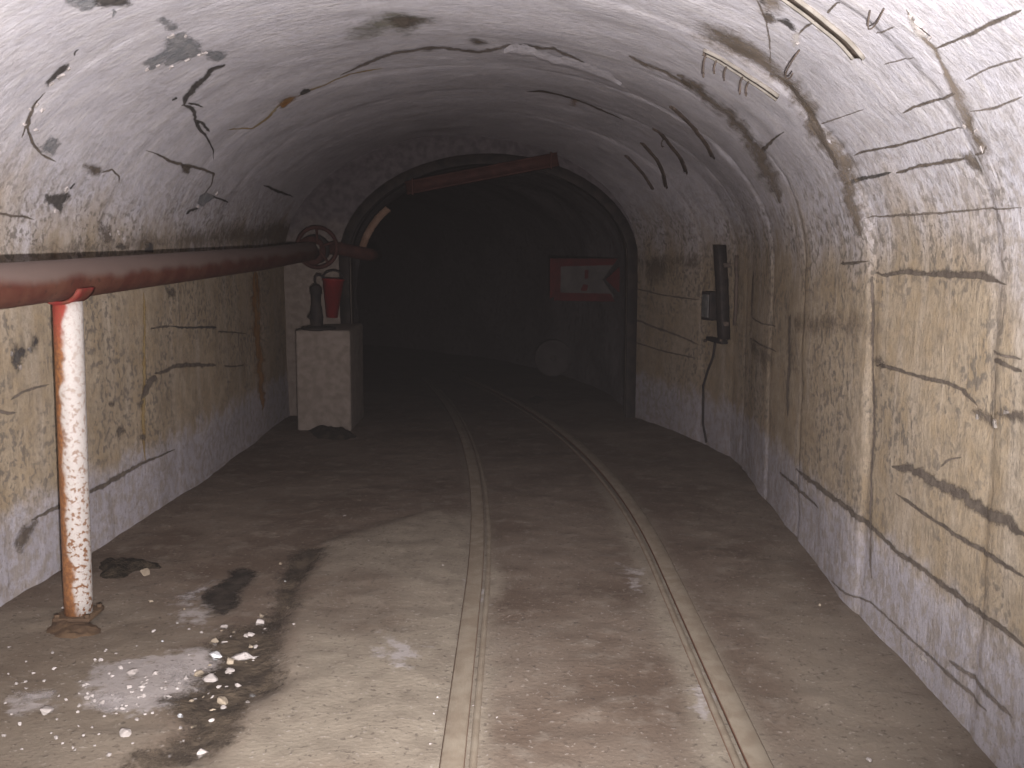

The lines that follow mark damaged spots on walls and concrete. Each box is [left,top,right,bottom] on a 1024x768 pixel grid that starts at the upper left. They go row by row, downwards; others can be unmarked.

spalling [144,18,226,72]
spalling [778,19,799,47]
crack [22,95,59,162]
crack [146,64,225,193]
spalling [45,183,75,213]
crack [876,364,977,405]